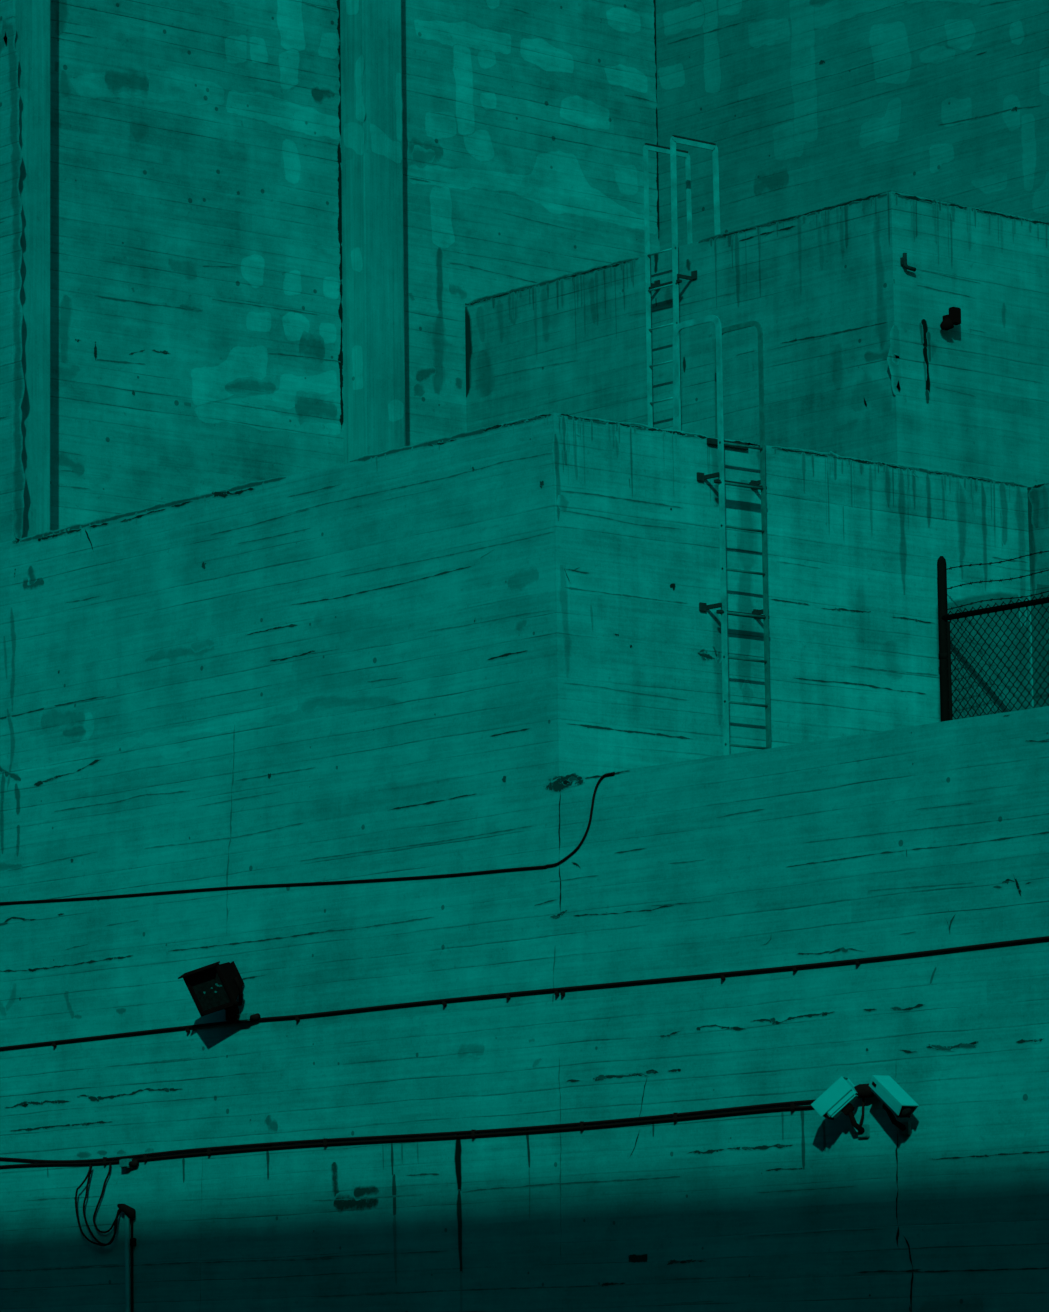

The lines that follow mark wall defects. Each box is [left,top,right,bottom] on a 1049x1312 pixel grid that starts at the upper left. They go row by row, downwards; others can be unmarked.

damp [412,247,659,399]
damp [698,192,1049,417]
damp [350,414,1049,725]
crack [857,1131,1049,1312]